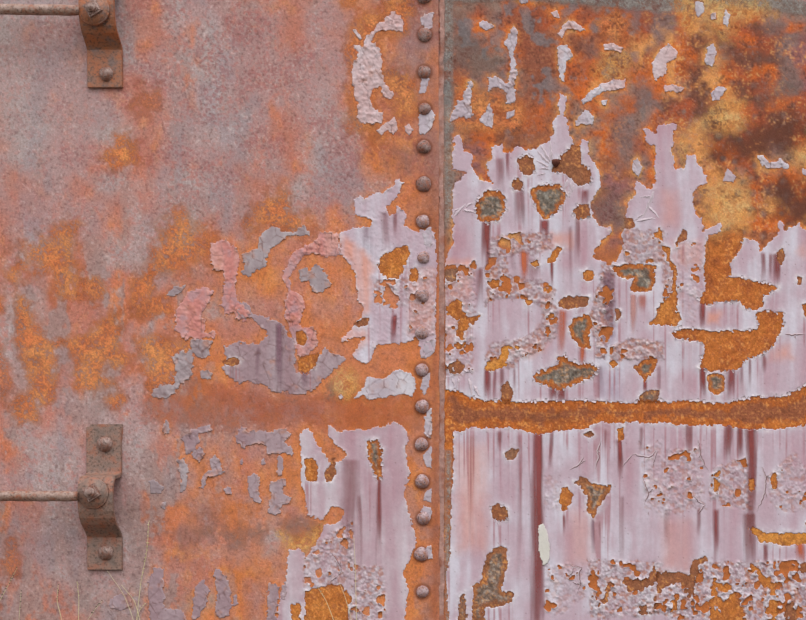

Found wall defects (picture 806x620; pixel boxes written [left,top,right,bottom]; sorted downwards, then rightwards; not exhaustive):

peeling [351,11,435,135]
peeling [603,43,624,53]
peeling [704,43,717,67]
corrosion [692,100,742,133]
corrosion [243,193,307,239]
corrosion [7,221,105,300]
corrosion [129,210,217,322]
corrosion [0,296,195,423]
peeling [147,78,806,620]
corrosion [725,425,756,503]
corrosion [533,434,553,620]
corrosion [746,515,754,546]